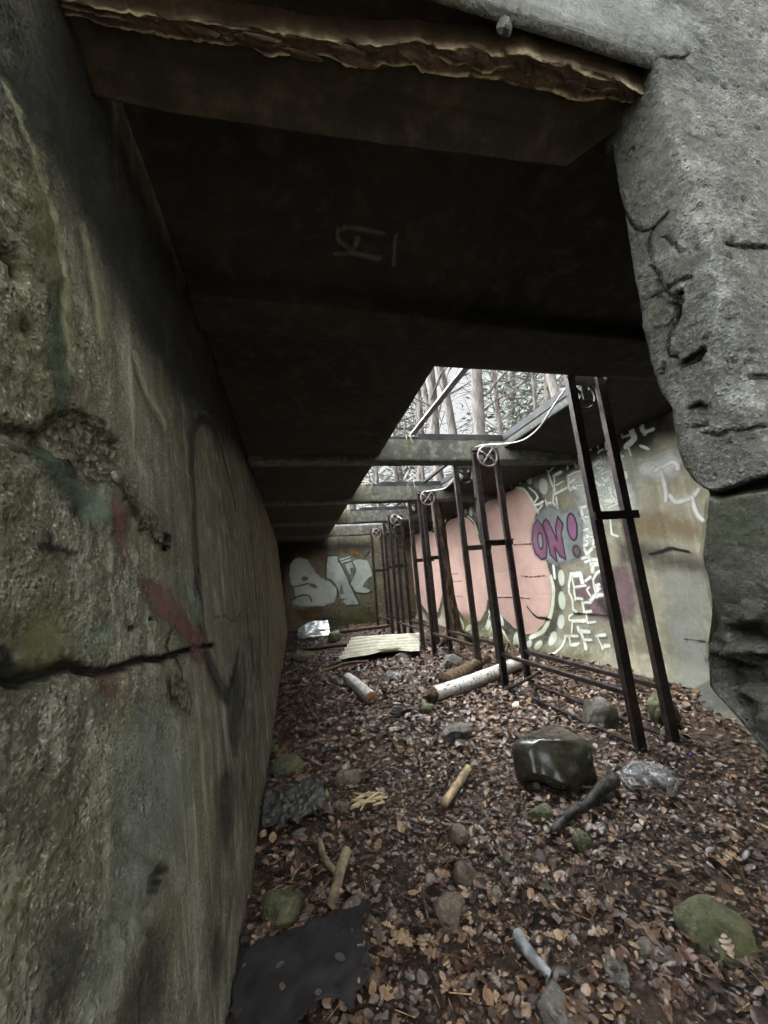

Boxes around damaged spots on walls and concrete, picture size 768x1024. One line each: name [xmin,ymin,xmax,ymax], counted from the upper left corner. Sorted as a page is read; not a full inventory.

spalling [60,0,643,103]
crack [725,241,768,249]
crack [624,210,692,375]
spalling [0,409,123,484]
crack [0,627,215,688]